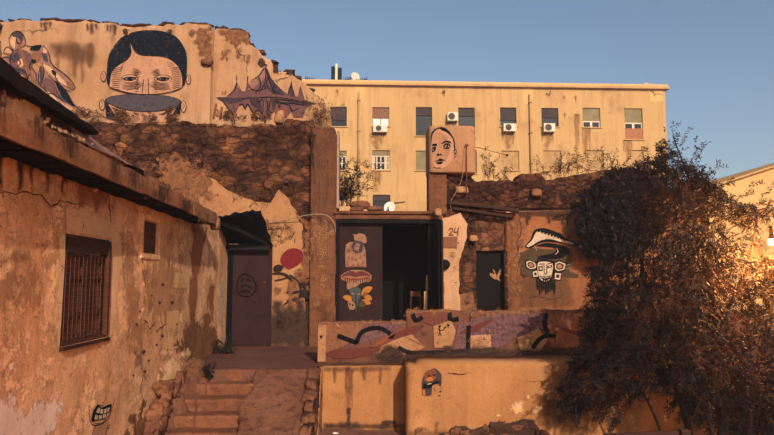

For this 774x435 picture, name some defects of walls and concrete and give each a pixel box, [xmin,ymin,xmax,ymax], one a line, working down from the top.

damp [53,43,92,75]
crack [0,191,113,232]
peeling [0,390,64,435]
spalling [439,395,551,435]